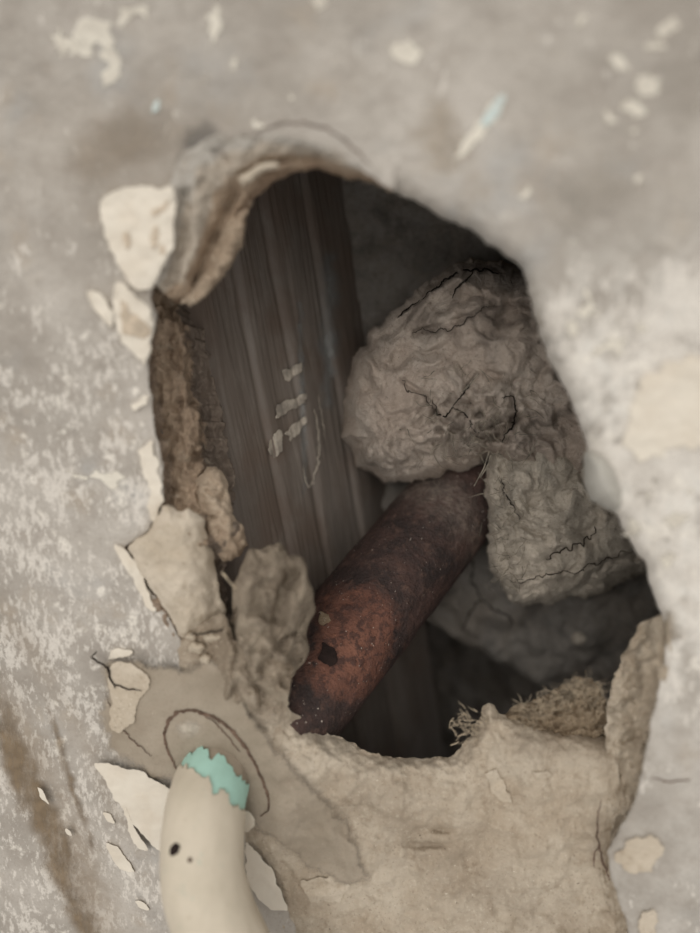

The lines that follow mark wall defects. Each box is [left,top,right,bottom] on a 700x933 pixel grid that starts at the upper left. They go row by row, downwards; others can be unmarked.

peeling [453,95,506,161]
peeling [622,355,700,462]
flaking render [87,119,672,933]
crack [90,651,141,706]